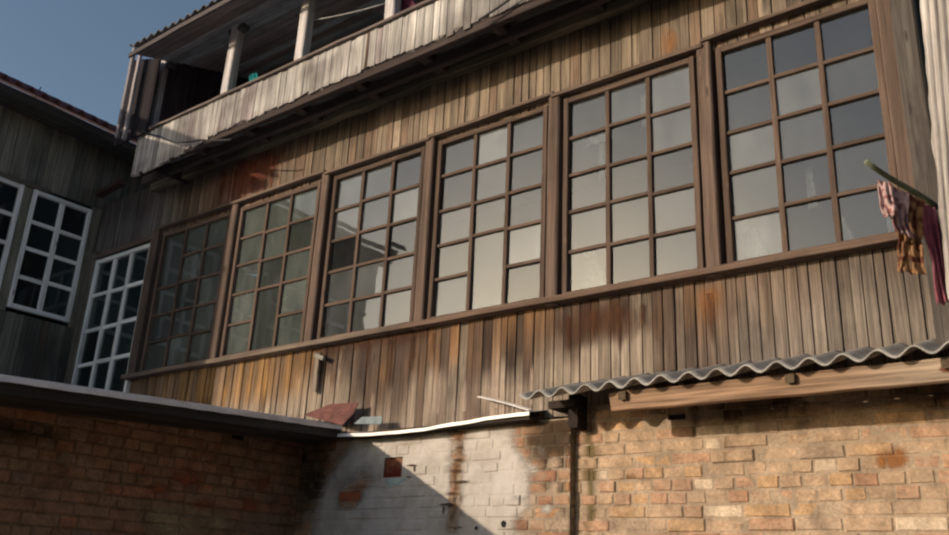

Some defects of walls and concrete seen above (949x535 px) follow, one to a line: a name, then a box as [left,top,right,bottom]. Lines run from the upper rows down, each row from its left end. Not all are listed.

peeling [313,427,538,535]